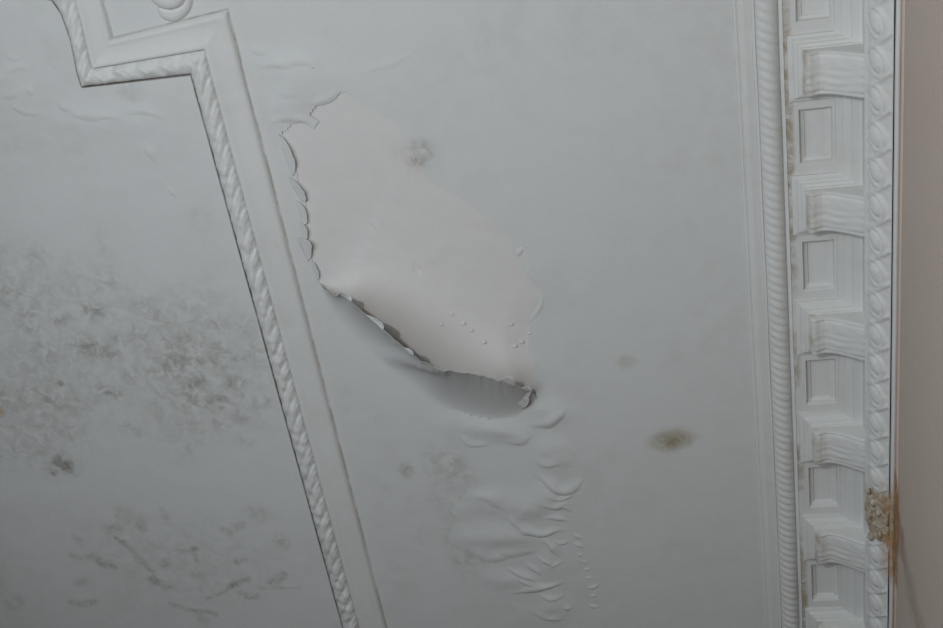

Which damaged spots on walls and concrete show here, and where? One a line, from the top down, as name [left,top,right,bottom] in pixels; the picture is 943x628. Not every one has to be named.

peeling [279,92,547,420]